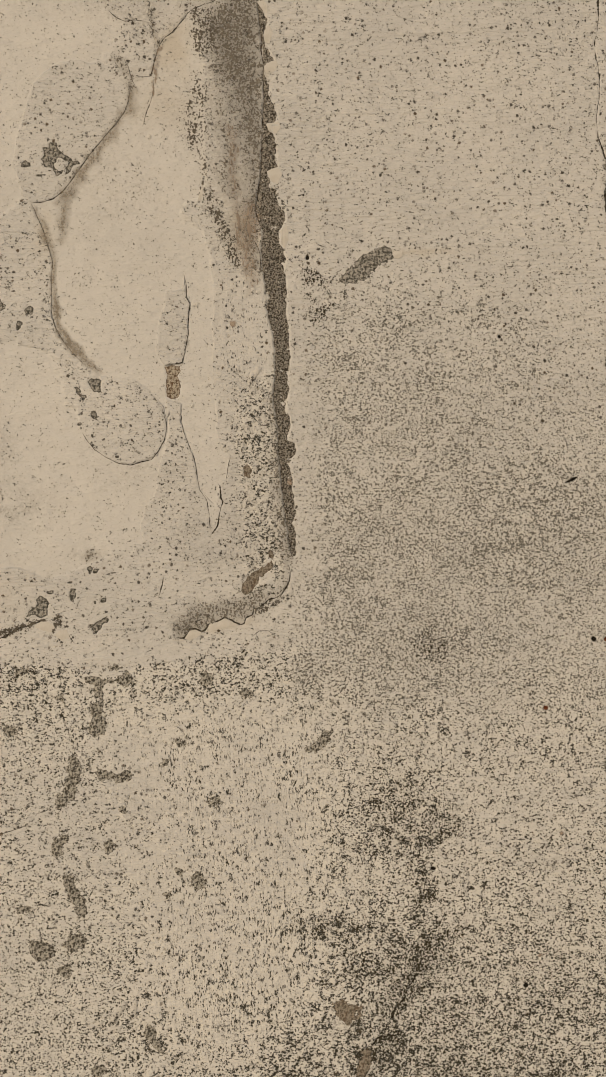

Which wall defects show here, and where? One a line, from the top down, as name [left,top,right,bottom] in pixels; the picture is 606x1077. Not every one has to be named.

crack [594,0,606,212]
spalling [21,142,80,177]
crack [33,0,264,364]
damp [179,0,270,276]
spalling [256,0,296,556]
spalling [16,306,33,330]
spalling [74,378,101,400]
spalling [165,364,181,399]
spalling [242,550,274,595]
spalling [26,590,70,640]
spalling [90,617,109,634]
peeling [179,616,254,641]